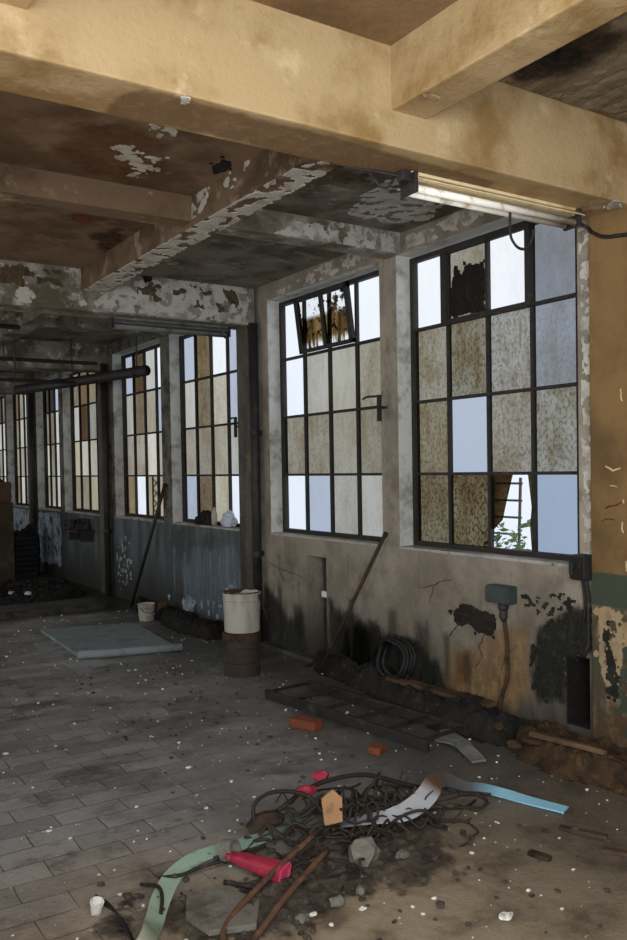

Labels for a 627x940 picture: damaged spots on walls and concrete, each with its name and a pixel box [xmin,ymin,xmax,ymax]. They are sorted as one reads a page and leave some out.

damp [513,30,627,82]
peeling [110,144,170,178]
spalling [209,156,250,189]
peeling [79,161,485,323]
peeling [15,265,36,303]
spalling [448,603,497,667]